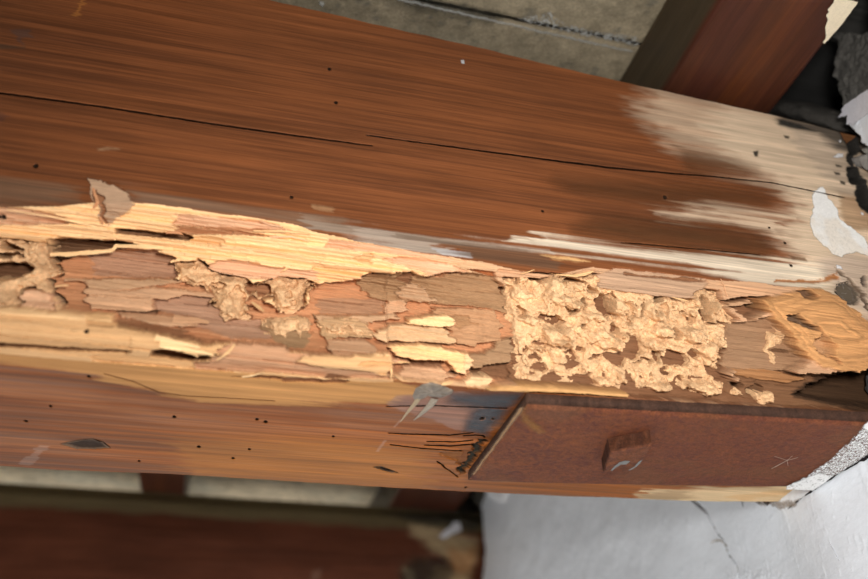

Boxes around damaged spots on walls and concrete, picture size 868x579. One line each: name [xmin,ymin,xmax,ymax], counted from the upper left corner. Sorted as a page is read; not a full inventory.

crack [0,93,844,198]
spalling [0,179,868,412]
crack [389,432,485,474]
corrosion [473,408,522,474]
crack [695,501,738,572]